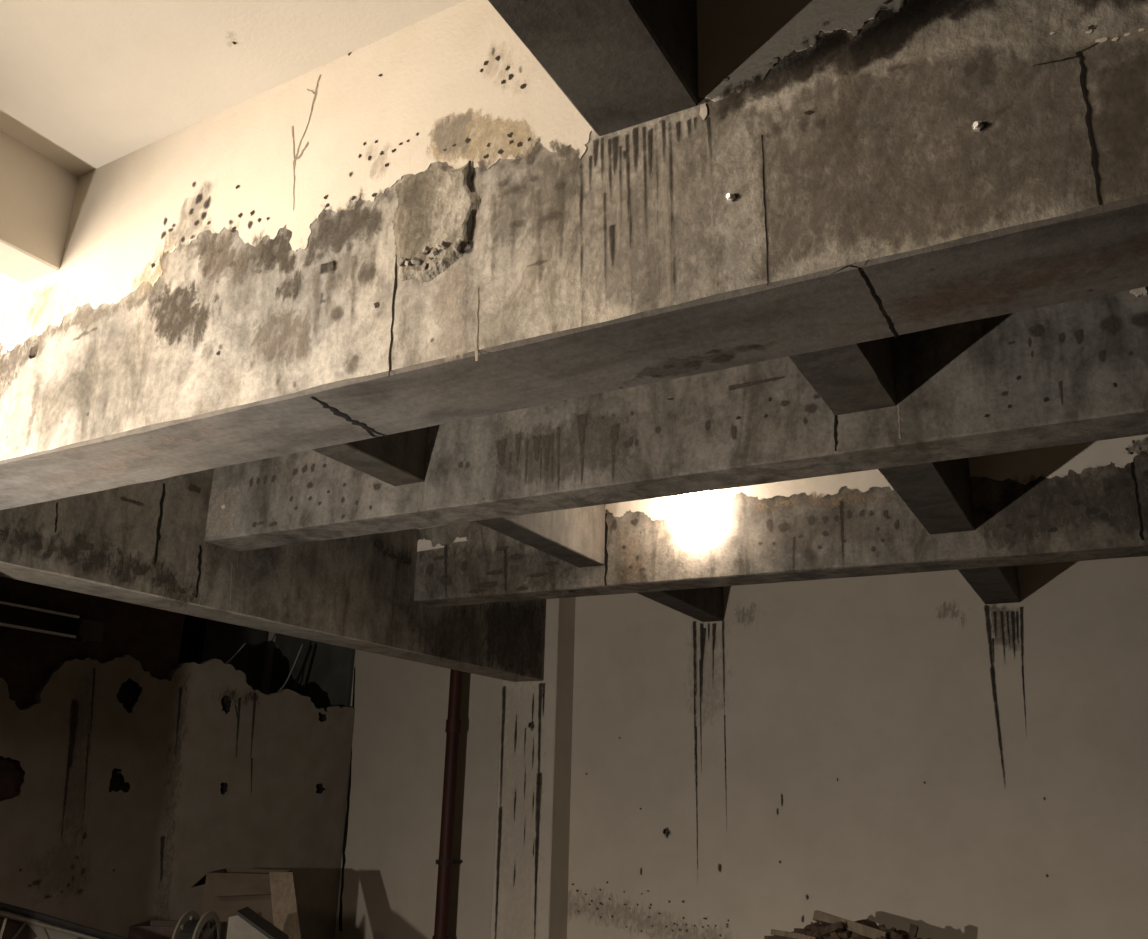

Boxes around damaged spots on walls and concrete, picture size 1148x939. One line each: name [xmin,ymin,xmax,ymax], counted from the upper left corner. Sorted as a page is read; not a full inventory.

damp [161,182,210,242]
spalling [0,139,578,385]
crack [388,254,397,377]
damp [358,109,536,167]
damp [580,117,710,267]
crack [1033,42,1102,205]
crack [310,397,388,437]
crack [154,484,165,564]
spalling [116,678,142,713]
damp [984,605,1026,783]
hole [0,756,25,801]
damp [484,604,545,939]